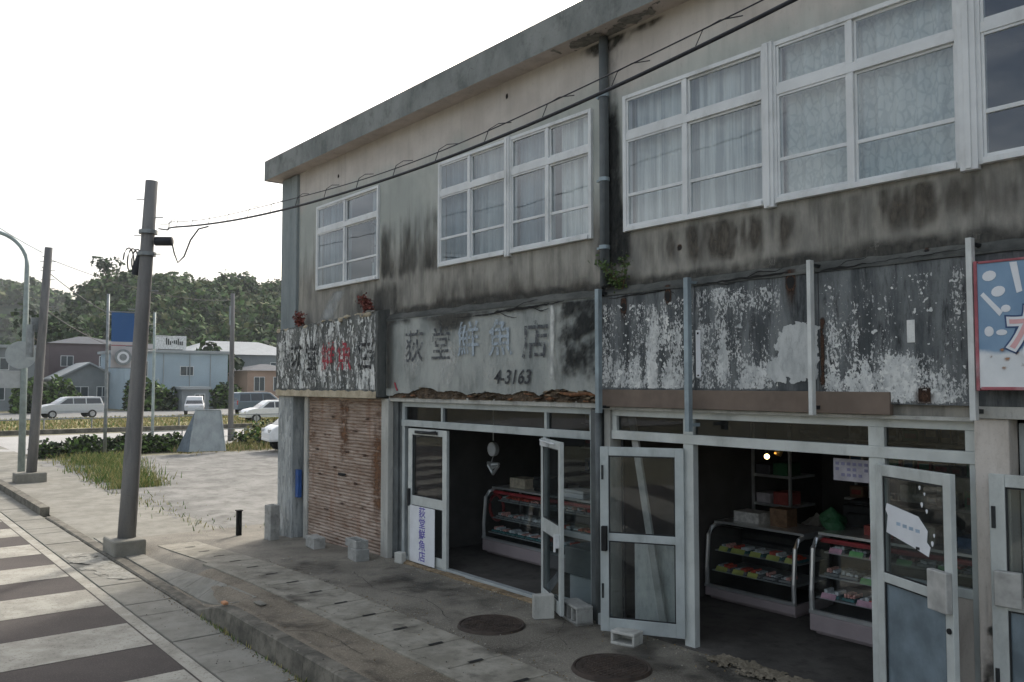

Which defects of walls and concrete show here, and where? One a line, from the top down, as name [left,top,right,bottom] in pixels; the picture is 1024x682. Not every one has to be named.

leakage [599,111,630,265]
leakage [763,182,1024,269]
leakage [374,218,761,388]
peeling [390,265,969,405]
peeling [277,310,376,534]
corrosion [362,436,381,510]